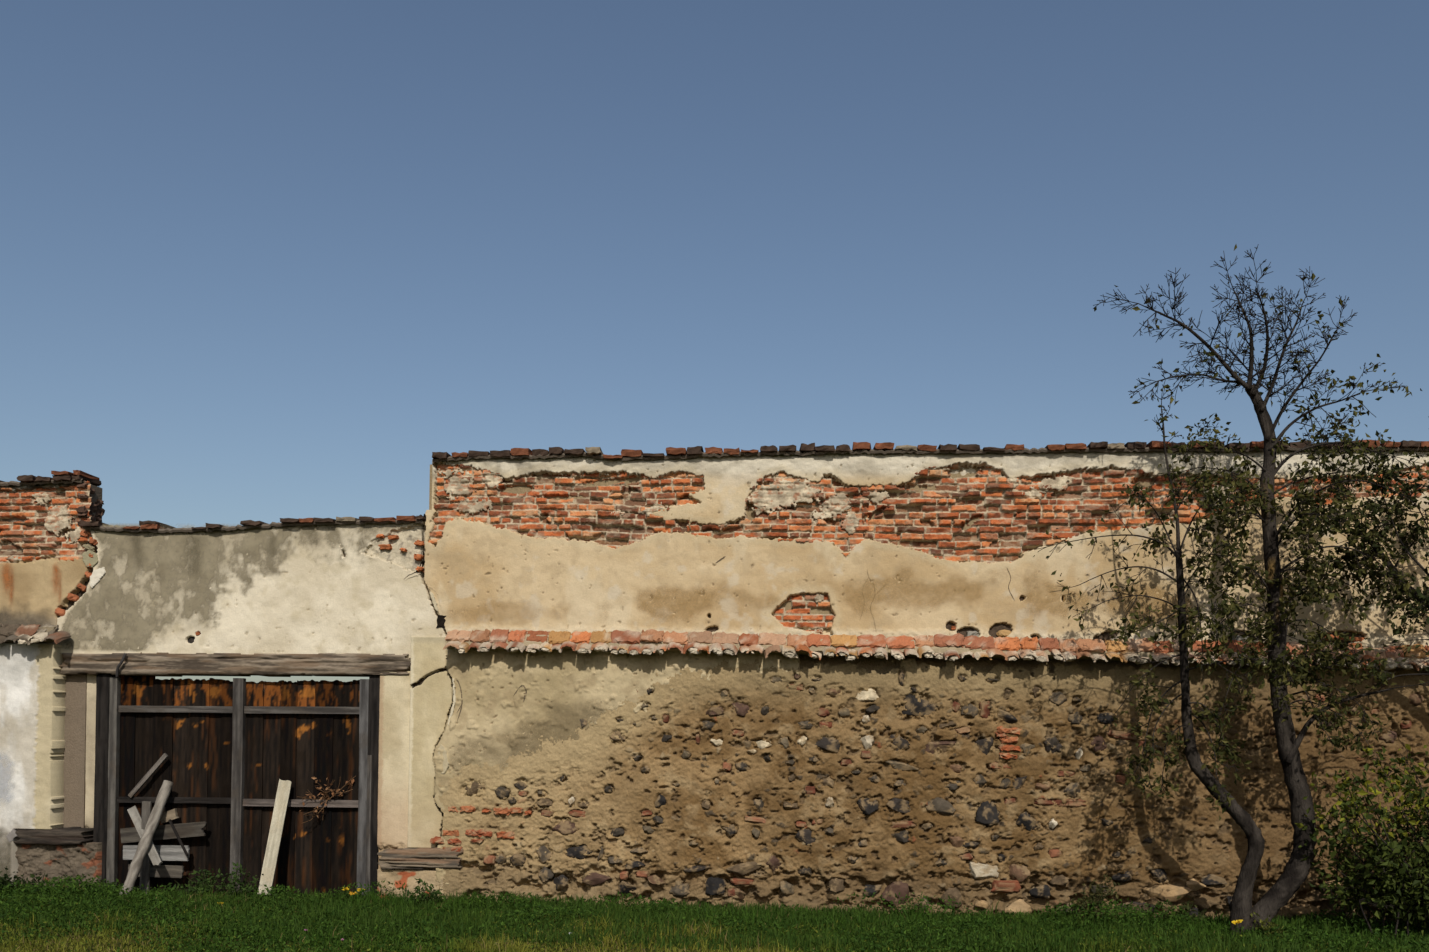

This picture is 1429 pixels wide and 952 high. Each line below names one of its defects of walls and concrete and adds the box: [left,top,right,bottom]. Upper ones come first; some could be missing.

spalling [0,481,97,563]
crack [404,514,463,845]
spalling [772,593,835,634]
spalling [430,658,1294,918]
spalling [365,463,1429,573]
spalling [1273,666,1429,929]